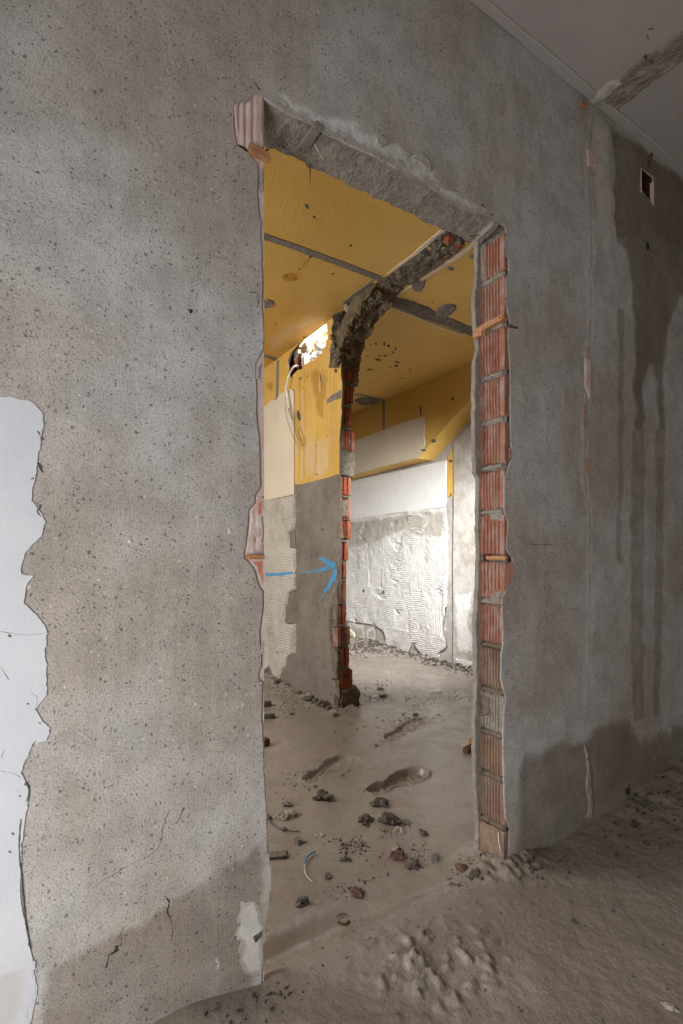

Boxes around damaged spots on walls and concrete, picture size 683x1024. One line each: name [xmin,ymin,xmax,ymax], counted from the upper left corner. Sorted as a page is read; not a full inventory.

peeling [0,396,50,1023]
damp [508,112,683,855]